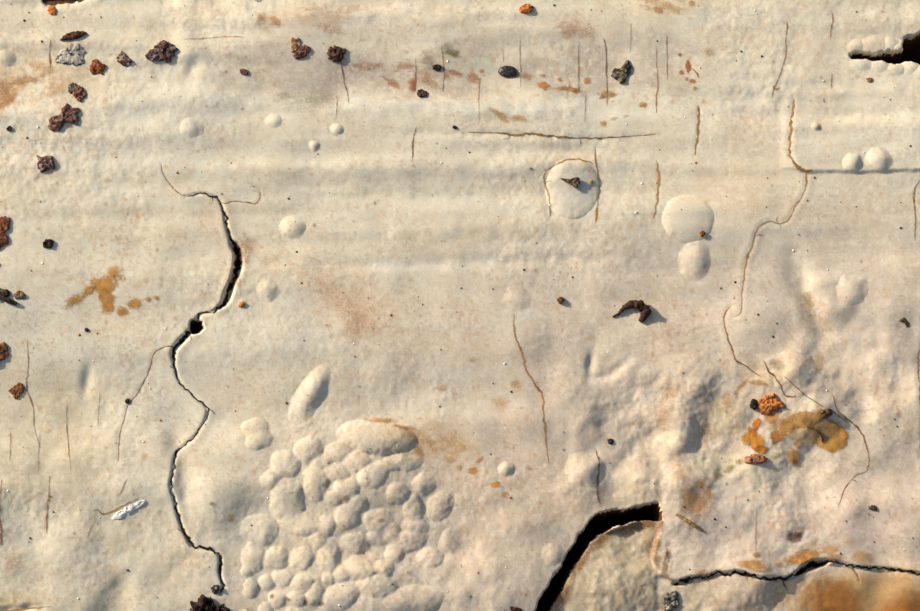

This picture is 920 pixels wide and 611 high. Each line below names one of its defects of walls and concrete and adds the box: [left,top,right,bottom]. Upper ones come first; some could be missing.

crack [118,166,260,593]
crack [675,512,920,589]
peeling [663,590,680,611]